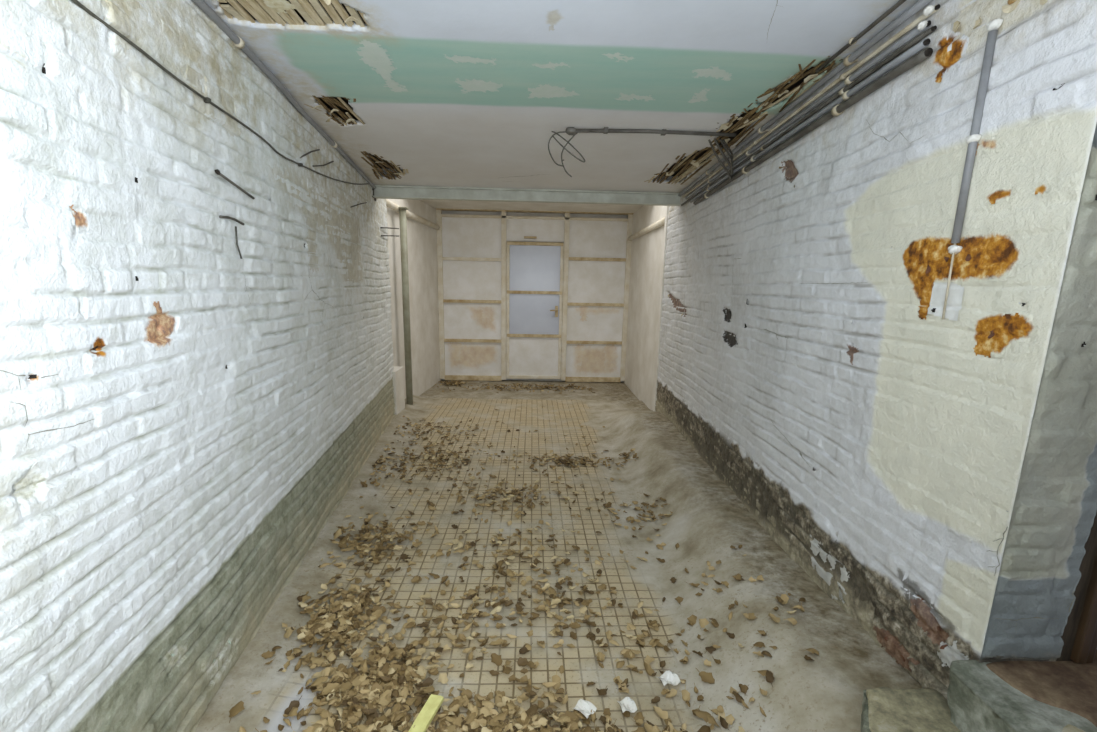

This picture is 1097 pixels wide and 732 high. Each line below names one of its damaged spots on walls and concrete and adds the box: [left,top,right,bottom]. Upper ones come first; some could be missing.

spalling [218,0,368,27]
corrosion [930,30,969,83]
spalling [304,95,365,126]
spalling [644,56,843,188]
spalling [361,151,409,180]
corrosion [899,228,1026,320]
corrosion [971,310,1038,359]
peeling [11,463,54,506]
leakage [672,389,878,620]
spalling [910,595,949,649]
leakage [891,557,1054,668]